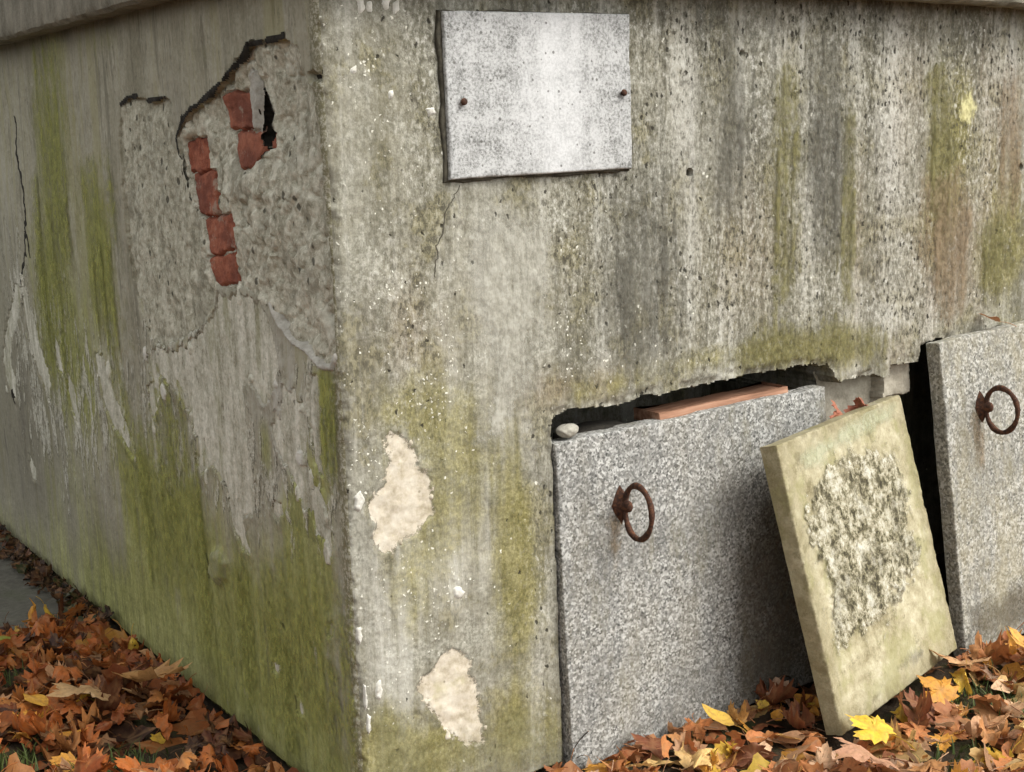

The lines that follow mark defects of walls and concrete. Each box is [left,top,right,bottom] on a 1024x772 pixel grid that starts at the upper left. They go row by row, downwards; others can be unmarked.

crack [14,116,30,285]
crack [434,185,460,276]
peeling [3,273,79,423]
peeling [96,353,137,463]
flaking render [119,32,338,565]
flaking render [354,431,435,554]
flaking render [417,649,487,748]